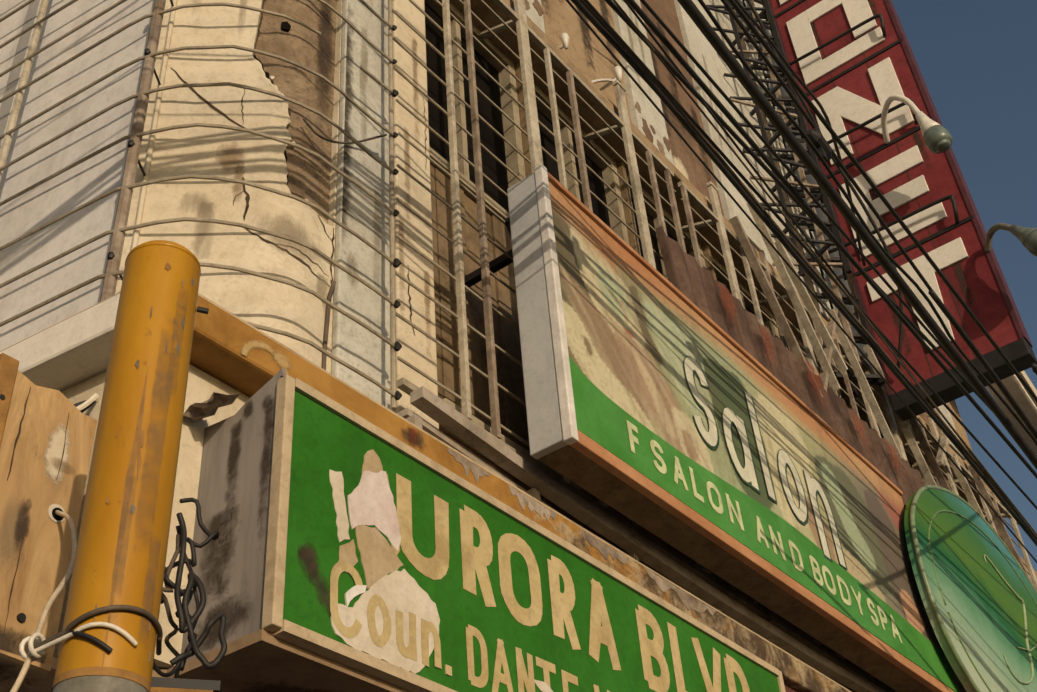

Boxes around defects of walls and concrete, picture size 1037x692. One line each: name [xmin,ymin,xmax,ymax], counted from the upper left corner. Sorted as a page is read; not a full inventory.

crack [171,0,274,128]
crack [283,109,291,185]
flaking render [246,0,337,226]
crack [233,178,335,287]
peeling [508,485,557,522]
peeling [579,528,629,564]
peeling [642,566,716,616]
damp [0,630,44,680]